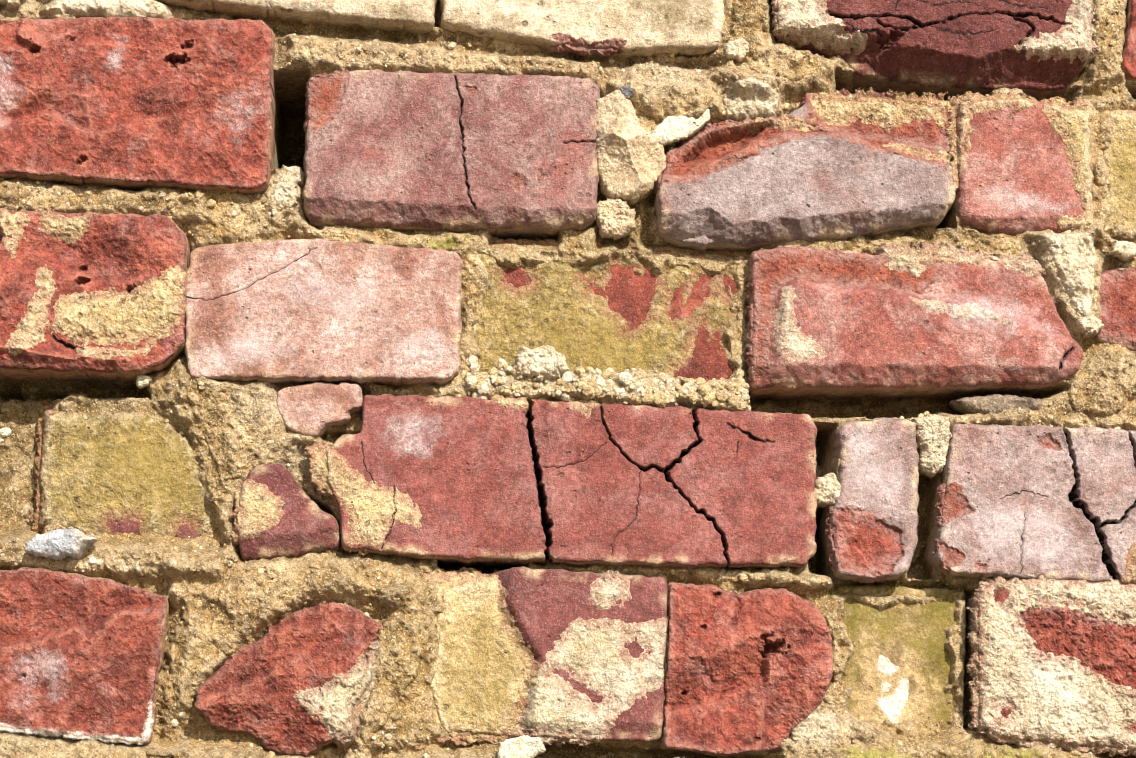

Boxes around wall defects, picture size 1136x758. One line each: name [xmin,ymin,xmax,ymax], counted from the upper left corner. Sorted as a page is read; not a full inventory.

crack [830,0,1058,45]
crack [455,77,475,206]
spalling [651,86,1136,247]
spalling [1099,266,1136,347]
crack [526,406,729,568]
crack [727,423,774,452]
crack [1000,432,1136,579]
spalling [194,599,383,757]
spalling [422,567,833,758]